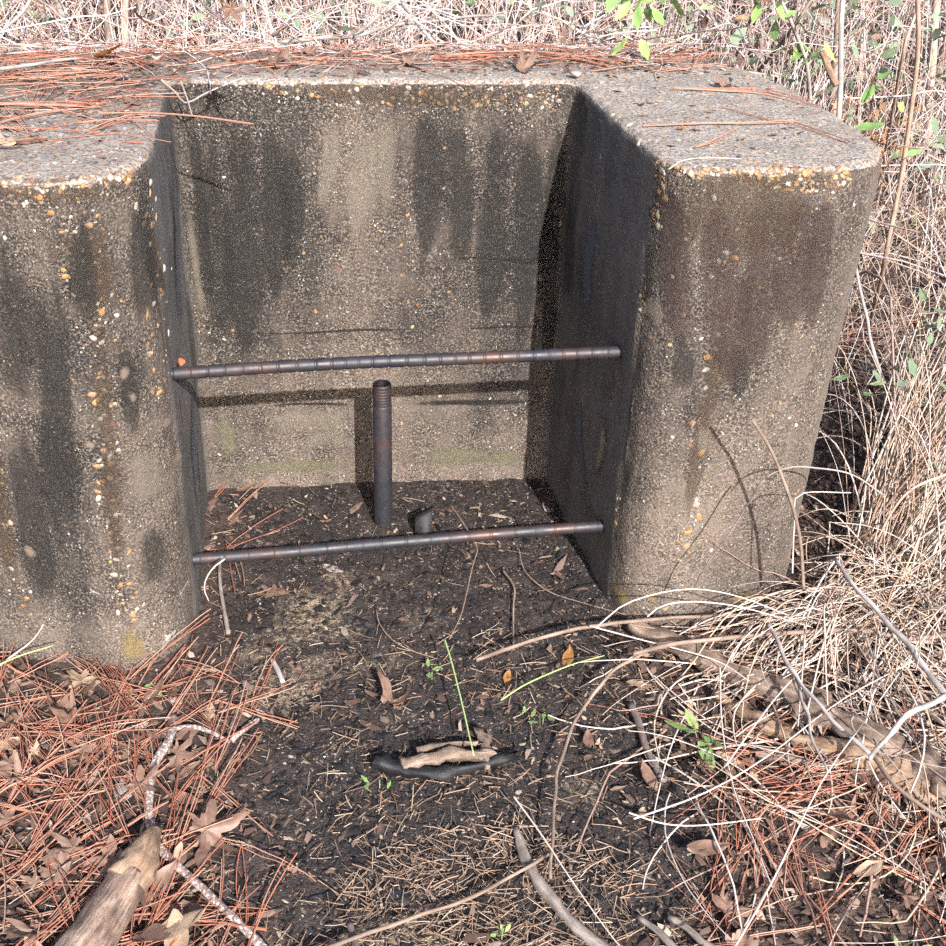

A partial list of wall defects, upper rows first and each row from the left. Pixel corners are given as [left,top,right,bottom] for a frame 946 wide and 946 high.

leakage [2,272,75,593]
leakage [121,357,138,424]
leakage [133,215,156,305]
leakage [191,136,302,349]
leakage [414,122,564,348]
leakage [644,199,691,381]
leakage [707,207,832,394]